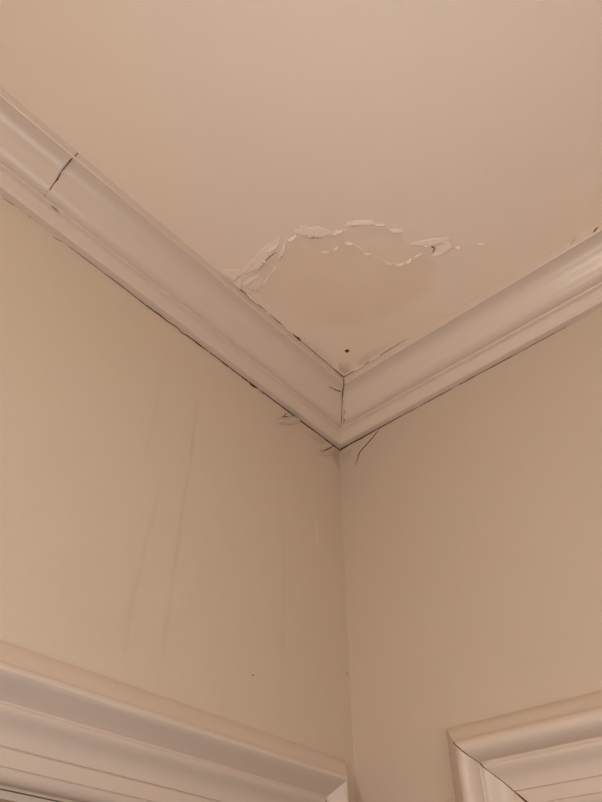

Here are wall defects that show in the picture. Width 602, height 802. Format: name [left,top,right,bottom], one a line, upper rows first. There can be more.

crack [43,153,78,197]
crack [54,237,564,465]